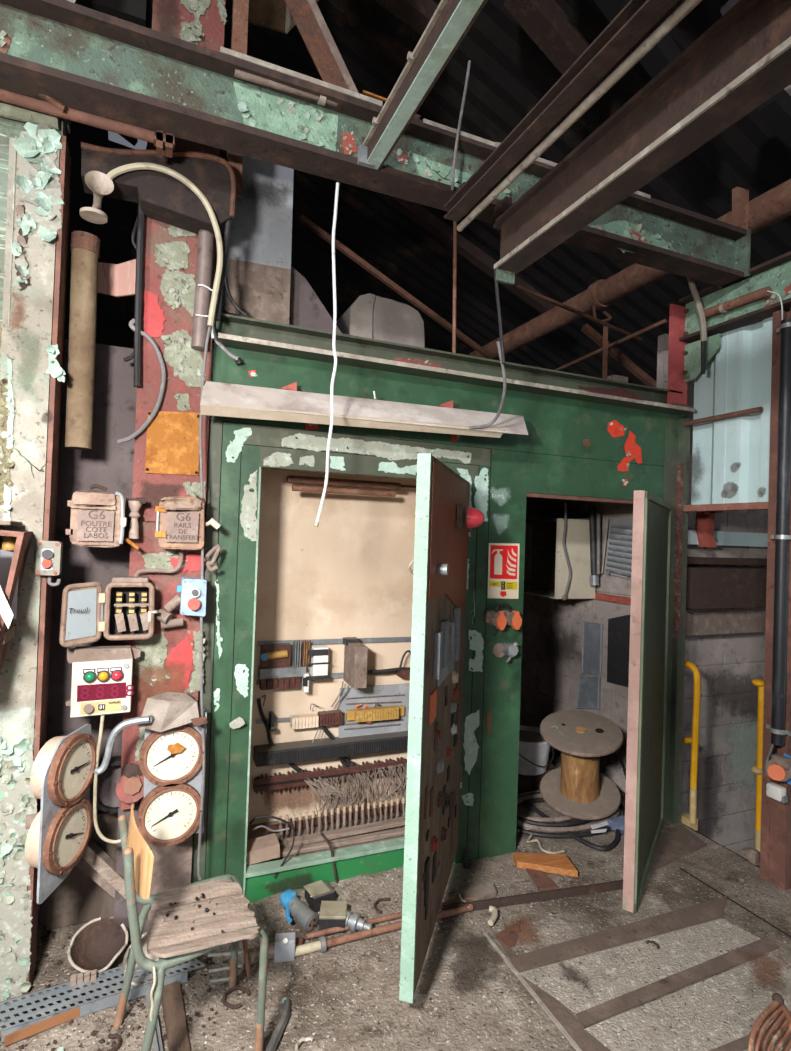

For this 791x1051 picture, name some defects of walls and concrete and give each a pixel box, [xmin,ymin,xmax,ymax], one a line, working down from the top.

peeling [179,0,227,45]
peeling [11,122,64,291]
peeling [142,225,206,411]
peeling [715,284,791,325]
spalling [0,322,16,530]
peeling [0,734,37,1000]